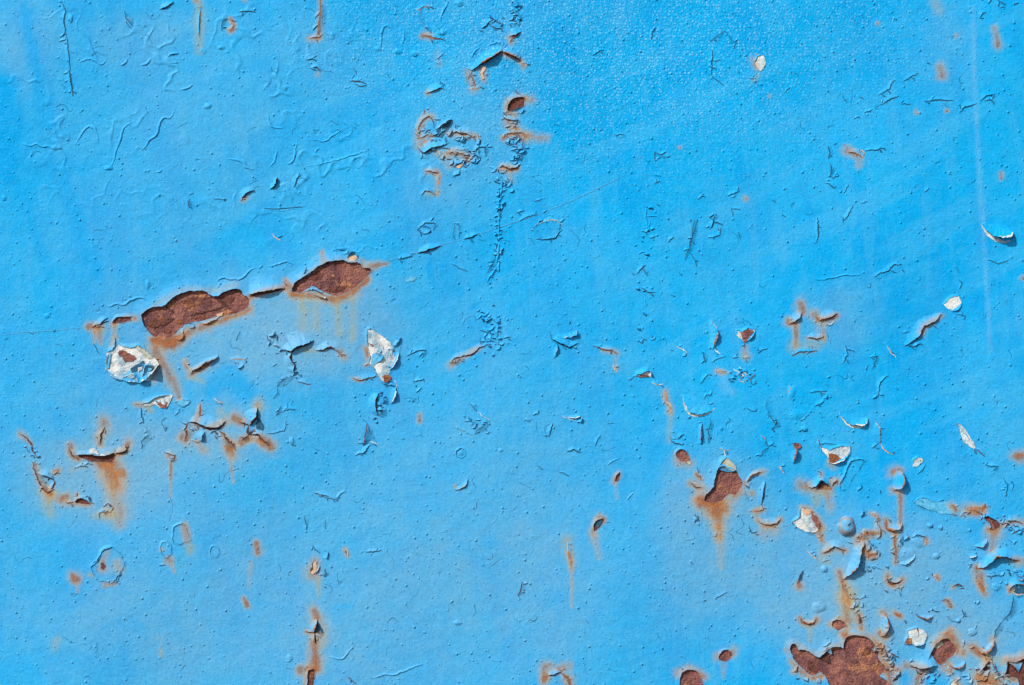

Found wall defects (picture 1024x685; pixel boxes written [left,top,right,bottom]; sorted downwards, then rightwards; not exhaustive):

corrosion [504,89,526,113]
corrosion [284,249,380,303]
peeling [92,337,160,383]
corrosion [111,278,254,379]
peeling [353,326,402,383]
corrosion [674,446,753,528]
peeling [791,505,823,541]
peeling [816,439,866,492]
peeling [885,455,967,563]
corrosion [783,593,891,685]
peeling [873,599,952,685]
corrosion [909,631,1024,685]